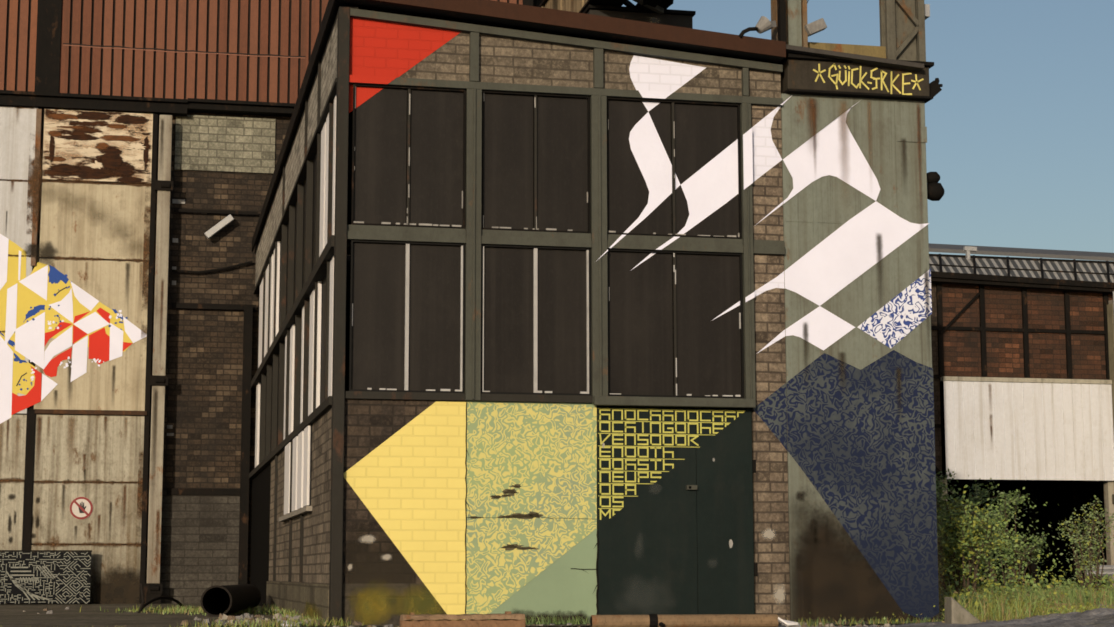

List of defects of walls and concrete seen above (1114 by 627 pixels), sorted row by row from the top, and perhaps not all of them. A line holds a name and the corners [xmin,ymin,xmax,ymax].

rust [808,99,816,140]
peeling [43,109,151,183]
spalling [490,484,522,499]
spalling [498,511,543,519]
leakage [775,518,939,622]